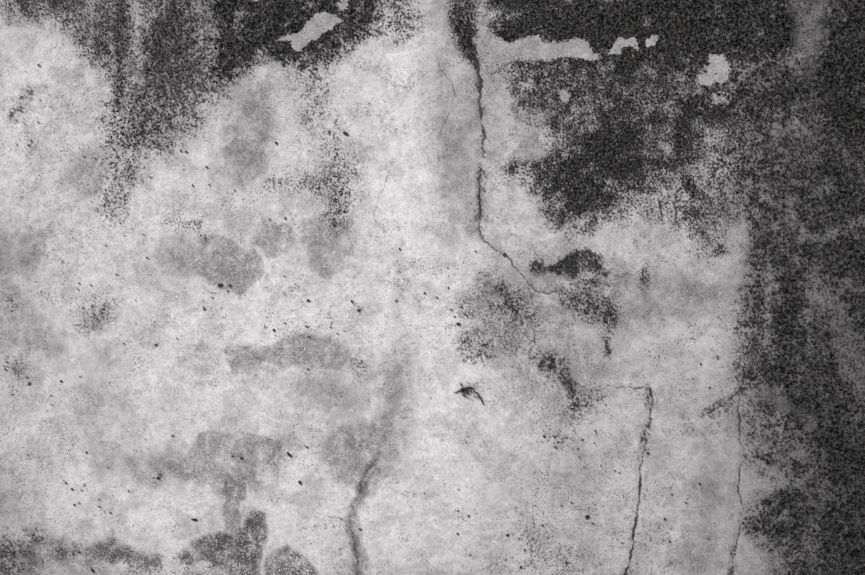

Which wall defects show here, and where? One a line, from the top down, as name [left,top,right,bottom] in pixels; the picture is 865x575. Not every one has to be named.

peeling [276,0,349,52]
peeling [474,0,659,73]
leakage [0,0,425,234]
peeling [507,134,548,165]
crack [423,51,657,575]
leakage [445,0,865,575]
leakage [154,433,316,575]
crack [317,457,378,575]